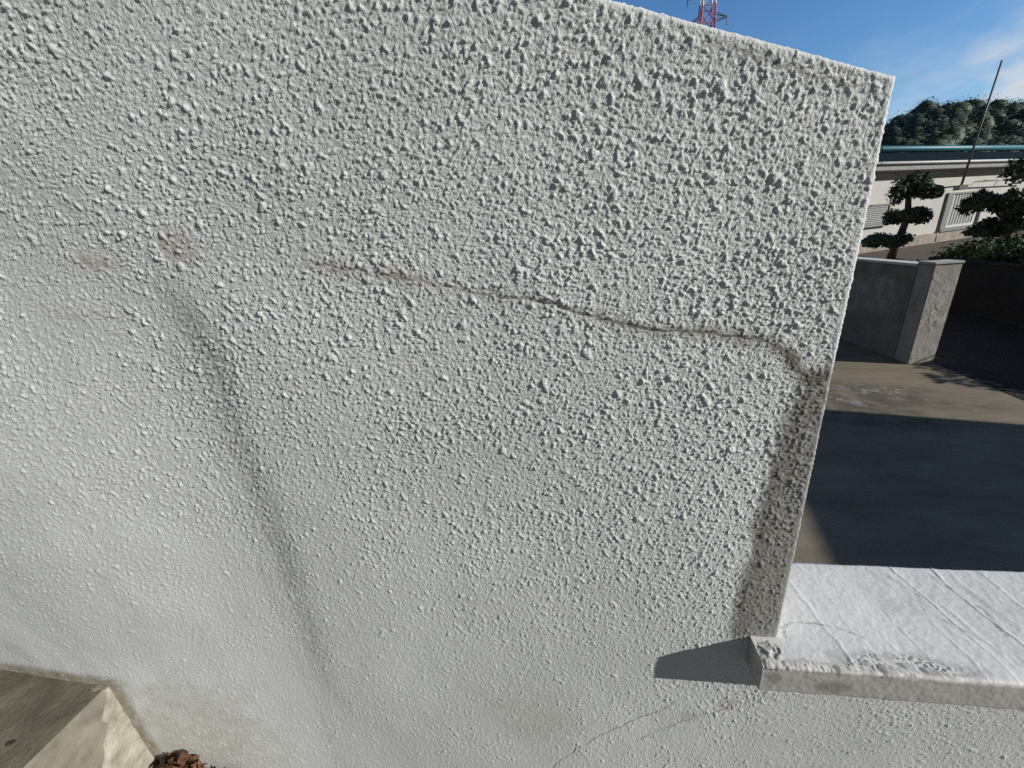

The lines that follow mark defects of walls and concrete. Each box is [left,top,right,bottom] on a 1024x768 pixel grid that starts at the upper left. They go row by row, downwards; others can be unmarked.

crack [468,291,676,332]
crack [714,332,827,383]